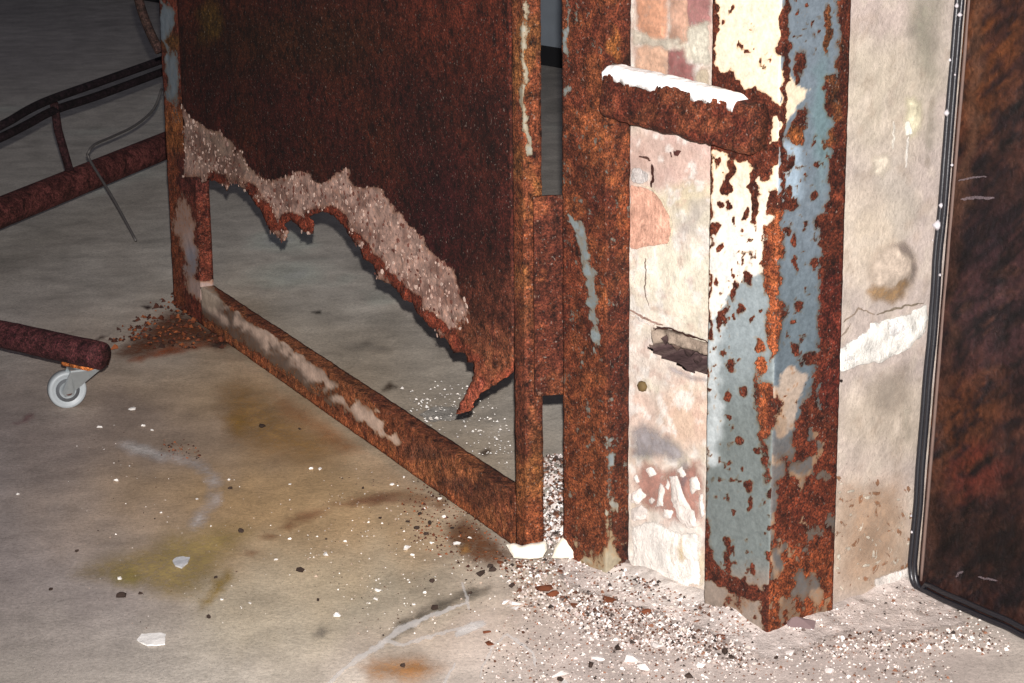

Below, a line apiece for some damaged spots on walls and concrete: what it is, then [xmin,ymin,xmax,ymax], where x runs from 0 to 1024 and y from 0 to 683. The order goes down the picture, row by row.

corrosion [181,104,468,337]
corrosion [124,314,228,355]
spalling [649,324,708,379]
crack [841,303,924,337]
flaking render [631,464,705,530]
corrosion [451,523,506,562]